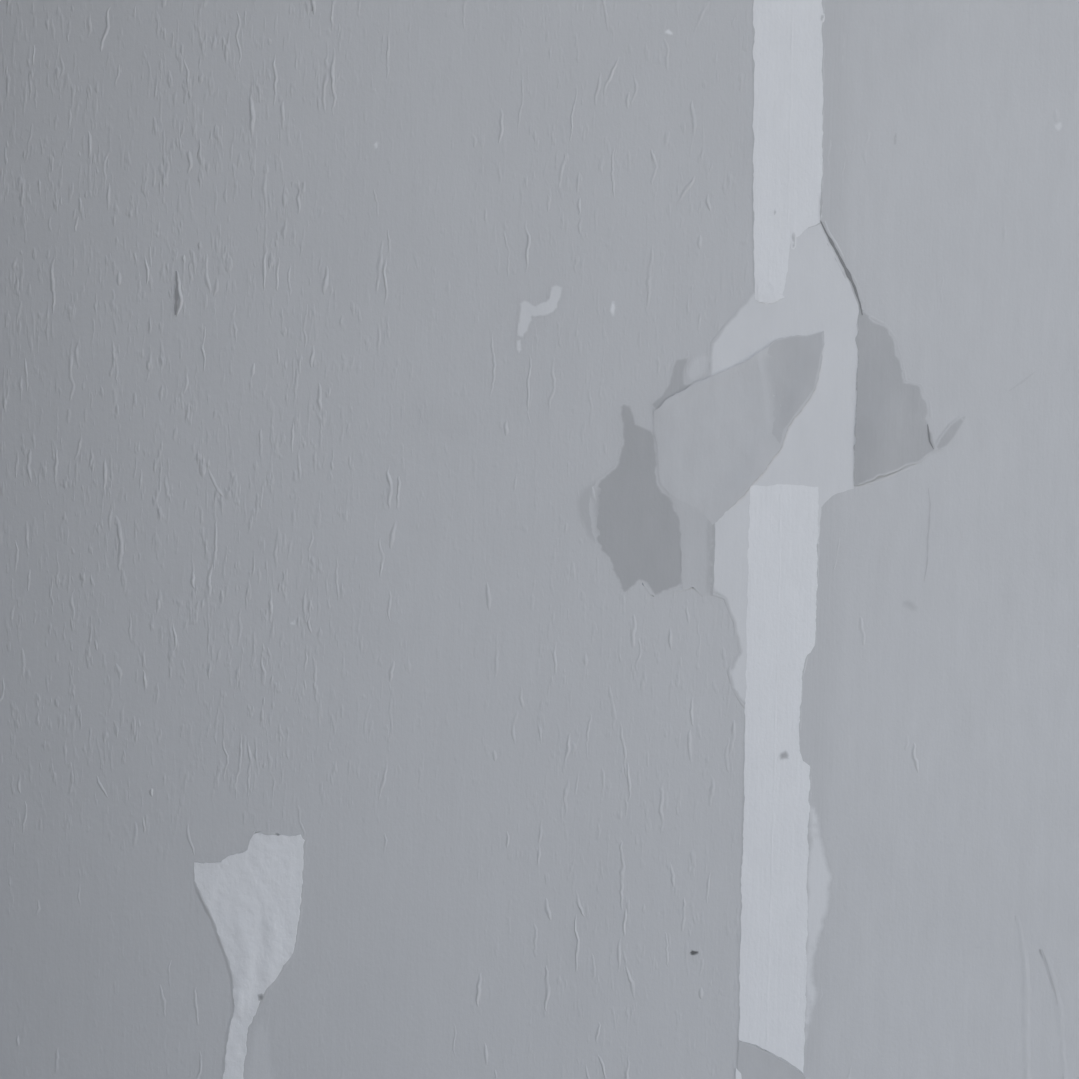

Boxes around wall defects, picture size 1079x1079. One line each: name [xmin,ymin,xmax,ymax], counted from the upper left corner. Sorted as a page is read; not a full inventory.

peeling [515,283,563,355]
peeling [573,0,969,1072]
peeling [193,831,308,1079]